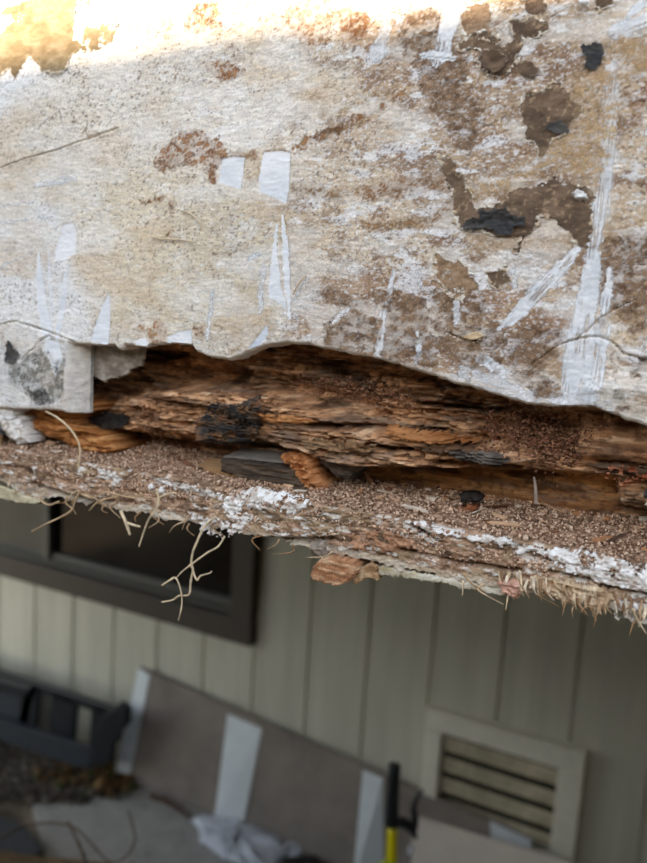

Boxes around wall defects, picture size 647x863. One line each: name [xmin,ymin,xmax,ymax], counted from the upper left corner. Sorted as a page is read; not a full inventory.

spalling [496,61,620,405]
spalling [167,329,192,344]
peeling [93,466,123,484]
peeling [148,458,311,538]